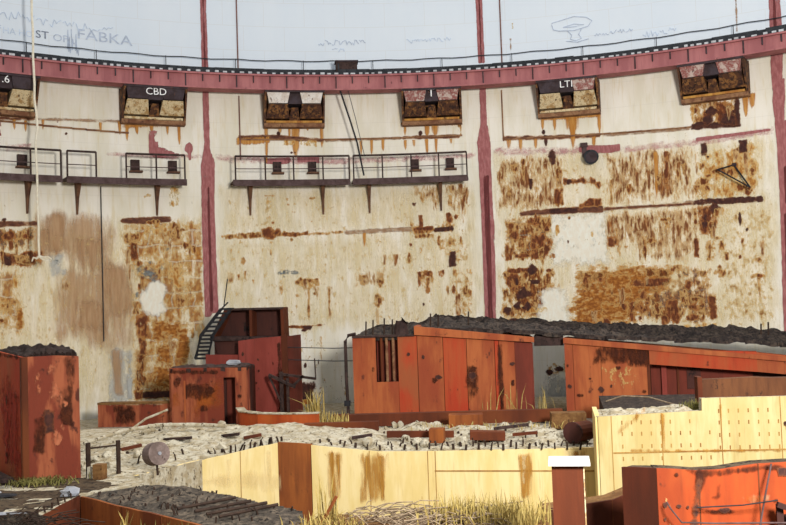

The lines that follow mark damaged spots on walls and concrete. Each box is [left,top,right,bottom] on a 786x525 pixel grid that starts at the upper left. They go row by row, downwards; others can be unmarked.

corrosion [237,123,461,163]
corrosion [33,387,73,453]
water stain [36,215,167,346]
water stain [109,348,132,401]
corrosion [113,404,138,424]
corrosion [109,216,218,411]
corrosion [221,183,472,330]
corrosion [497,93,765,327]